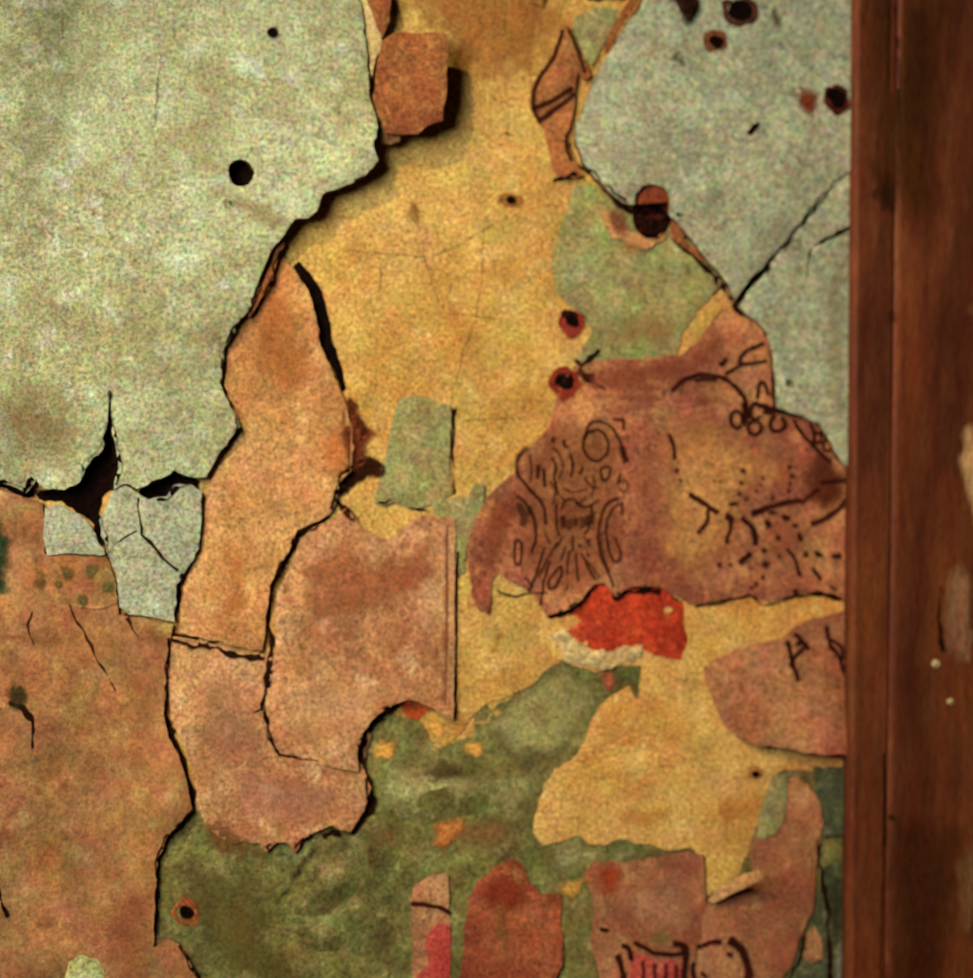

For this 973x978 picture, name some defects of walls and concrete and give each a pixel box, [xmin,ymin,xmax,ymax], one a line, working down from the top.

corrosion [704,0,751,51]
corrosion [799,84,850,113]
crack [553,165,647,226]
crack [674,186,850,316]
crack [219,247,346,453]
peeling [0,0,851,622]
corrosion [554,372,582,401]
corrosion [560,312,585,339]
crack [450,408,458,494]
crack [0,390,355,978]
peeling [154,484,844,978]
peeling [65,954,105,978]